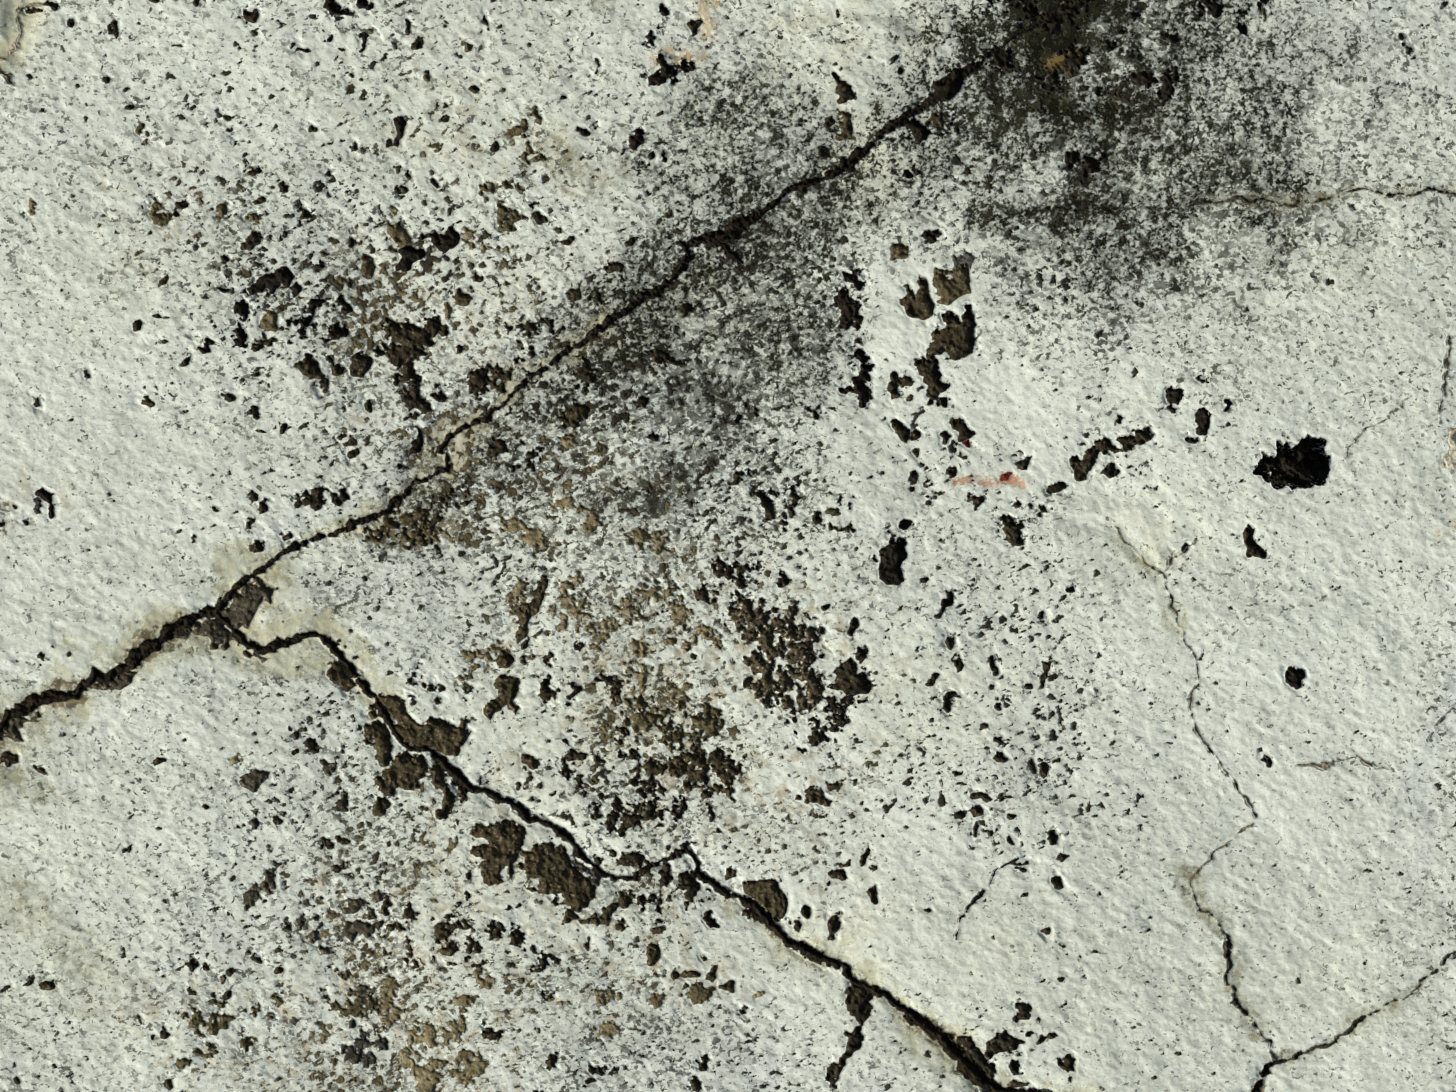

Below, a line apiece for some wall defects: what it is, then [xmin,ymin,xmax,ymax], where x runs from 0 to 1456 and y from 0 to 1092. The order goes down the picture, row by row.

crack [976,184,1456,223]
damp [361,0,1442,552]
peeling [355,481,482,552]
crack [0,0,1103,1092]
peeling [806,251,978,506]
spalling [1253,435,1330,490]
crack [1345,336,1452,460]
peeling [236,811,286,830]
peeling [264,517,878,1092]
crack [1115,526,1456,1092]
peeling [216,868,276,916]
peeling [164,955,284,1091]